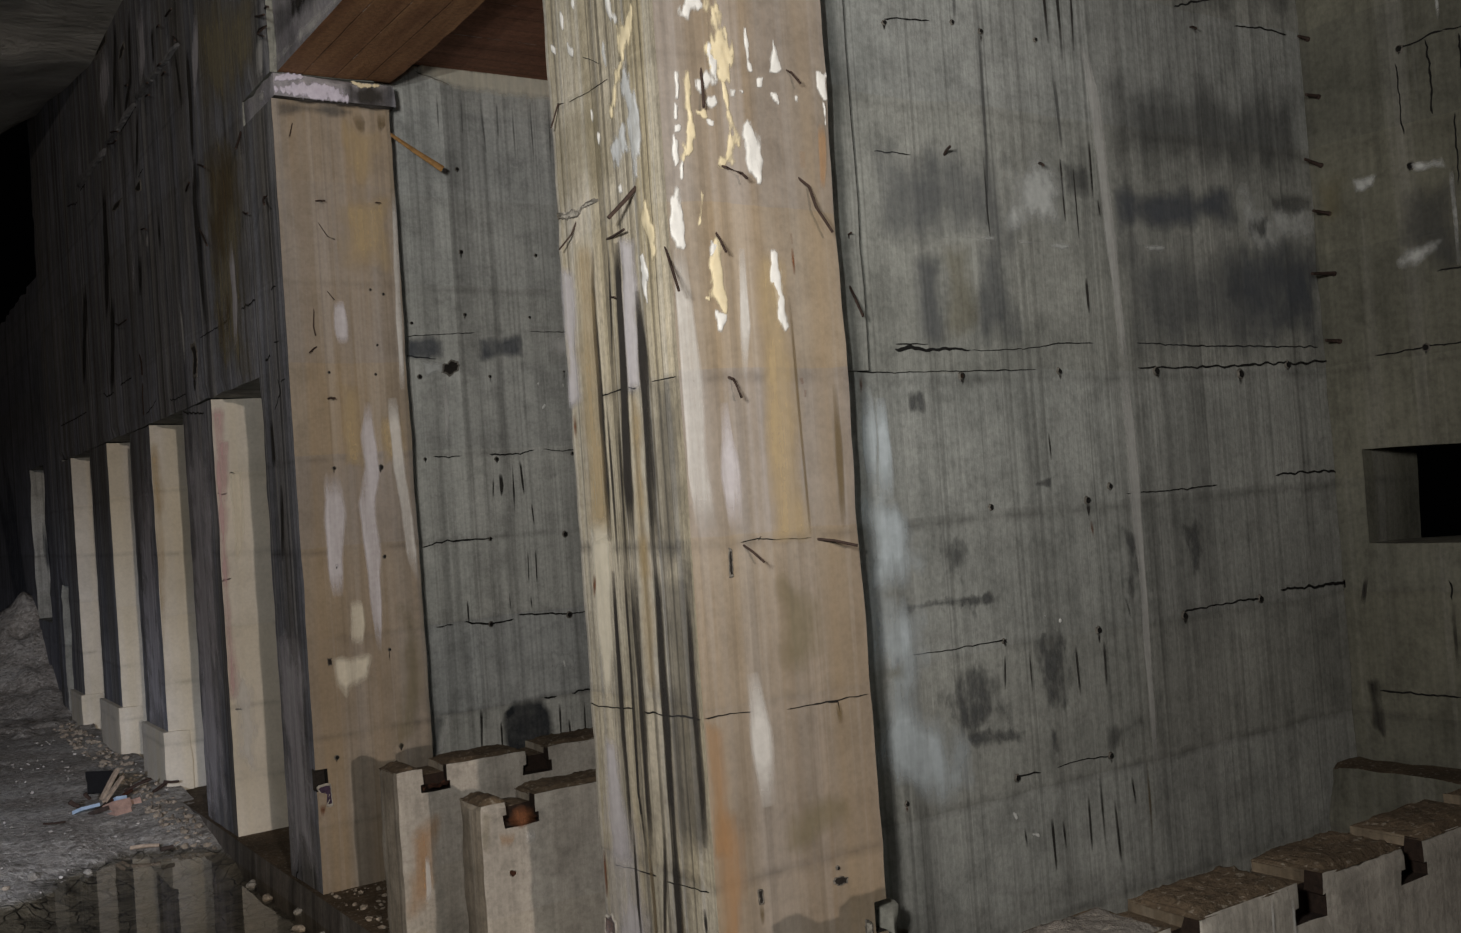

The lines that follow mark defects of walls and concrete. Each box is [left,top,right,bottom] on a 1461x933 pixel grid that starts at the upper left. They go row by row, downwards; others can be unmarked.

peeling [550,0,574,56]
leakage [1043,0,1073,40]
peeling [590,0,640,193]
peeling [816,71,827,124]
peeling [640,0,798,303]
leakage [1010,77,1229,335]
peeling [706,238,727,331]
peeling [769,250,789,331]
crack [857,342,1090,374]
crack [1139,343,1327,369]
leakage [552,244,705,933]
leakage [1127,415,1154,725]